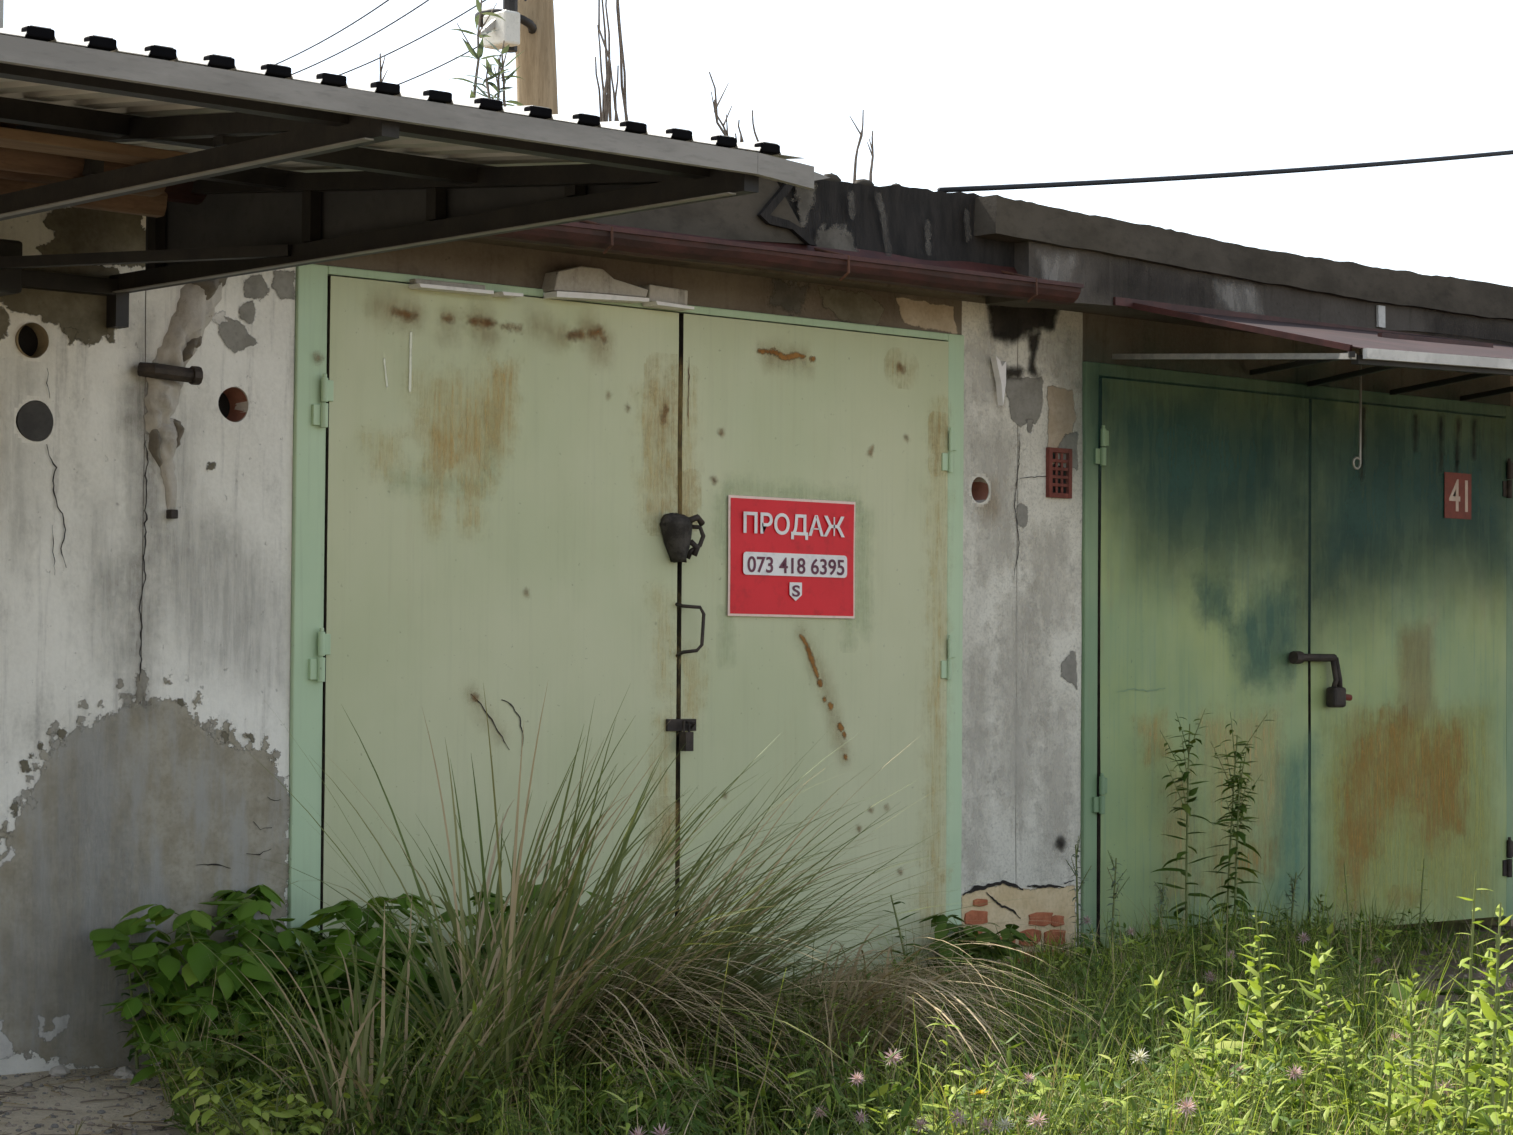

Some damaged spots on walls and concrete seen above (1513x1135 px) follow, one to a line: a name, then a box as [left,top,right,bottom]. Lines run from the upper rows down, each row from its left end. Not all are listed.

peeling [212,270,295,353]
rust [568,328,605,341]
crack [46,444,67,569]
crack [139,441,149,679]
rust [799,634,848,760]
spalling [0,668,290,1069]
spalling [961,883,1076,973]